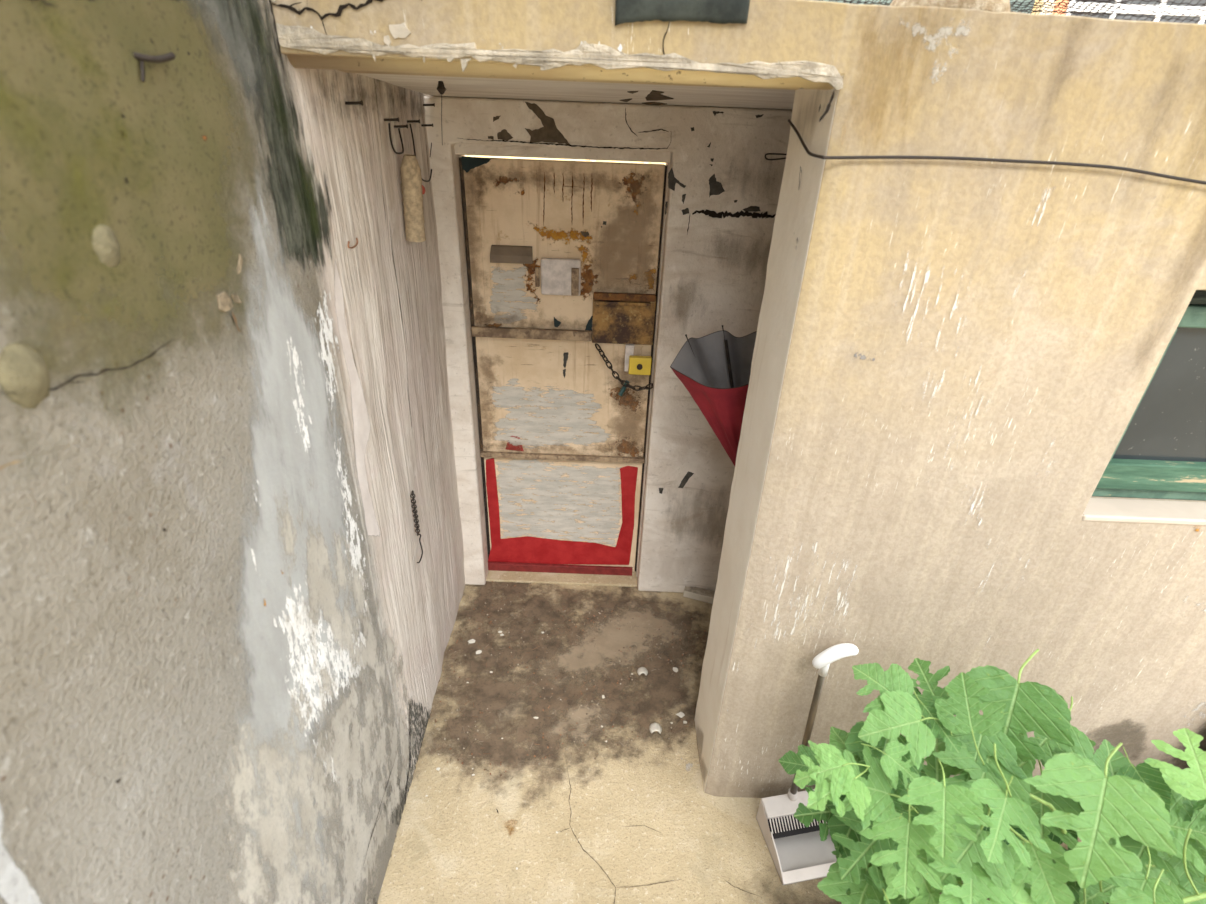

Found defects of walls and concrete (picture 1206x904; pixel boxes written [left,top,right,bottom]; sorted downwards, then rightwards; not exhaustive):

crack [269,0,383,73]
peeling [620,90,674,105]
peeling [525,102,570,145]
damp [295,158,320,245]
peeling [461,156,491,173]
corrosion [493,176,525,195]
corrosion [619,172,646,215]
corrosion [528,172,598,300]
corrosion [522,258,540,302]
crack [49,339,176,390]
peeling [225,439,415,904]
crack [561,755,682,904]